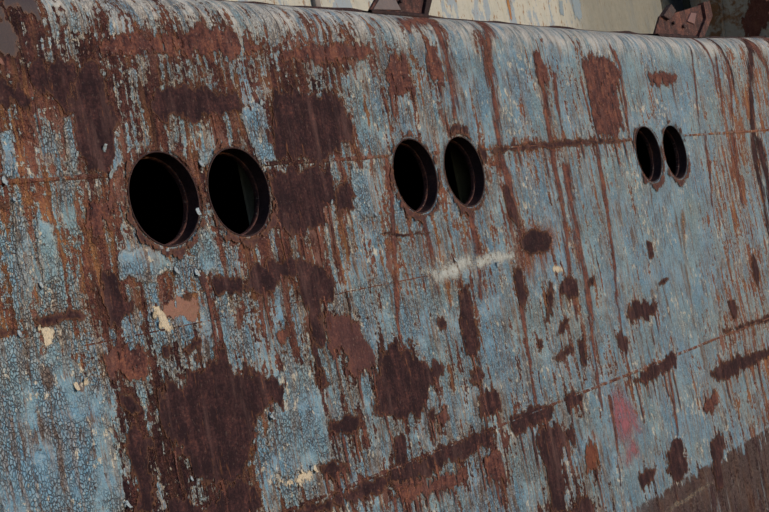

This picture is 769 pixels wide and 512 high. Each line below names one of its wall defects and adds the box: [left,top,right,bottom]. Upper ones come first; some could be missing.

corrosion [0,0,43,58]
corrosion [0,16,378,244]
corrosion [739,0,769,235]
corrosion [145,17,688,512]
corrosion [752,254,760,286]
corrosion [0,328,28,338]
corrosion [34,306,88,328]
corrosion [723,299,769,333]
peeling [0,325,132,512]
corrosion [92,268,170,512]
corrosion [702,348,769,414]
corrosion [710,429,725,492]